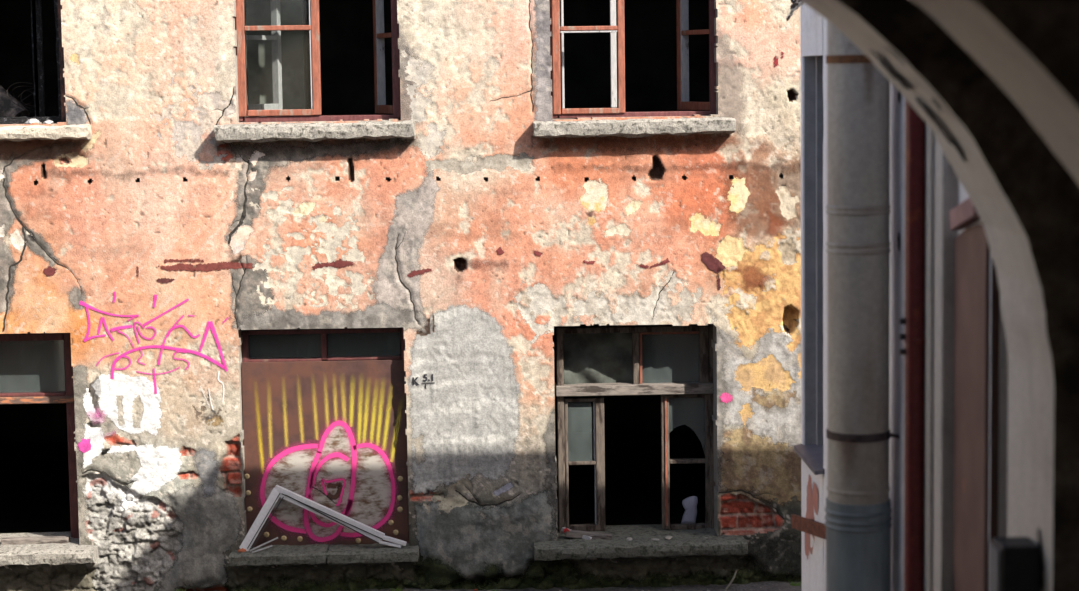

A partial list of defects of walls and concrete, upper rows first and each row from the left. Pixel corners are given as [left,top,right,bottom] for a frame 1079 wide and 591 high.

crack [212,88,234,125]
peeling [149,77,375,311]
crack [2,152,82,332]
crack [228,151,256,329]
crack [395,232,419,324]
peeling [514,177,818,535]
flaking render [104,433,137,446]
flaking render [179,446,196,456]
flaking render [177,470,199,479]
peeling [192,394,224,426]
flaking render [218,433,243,497]